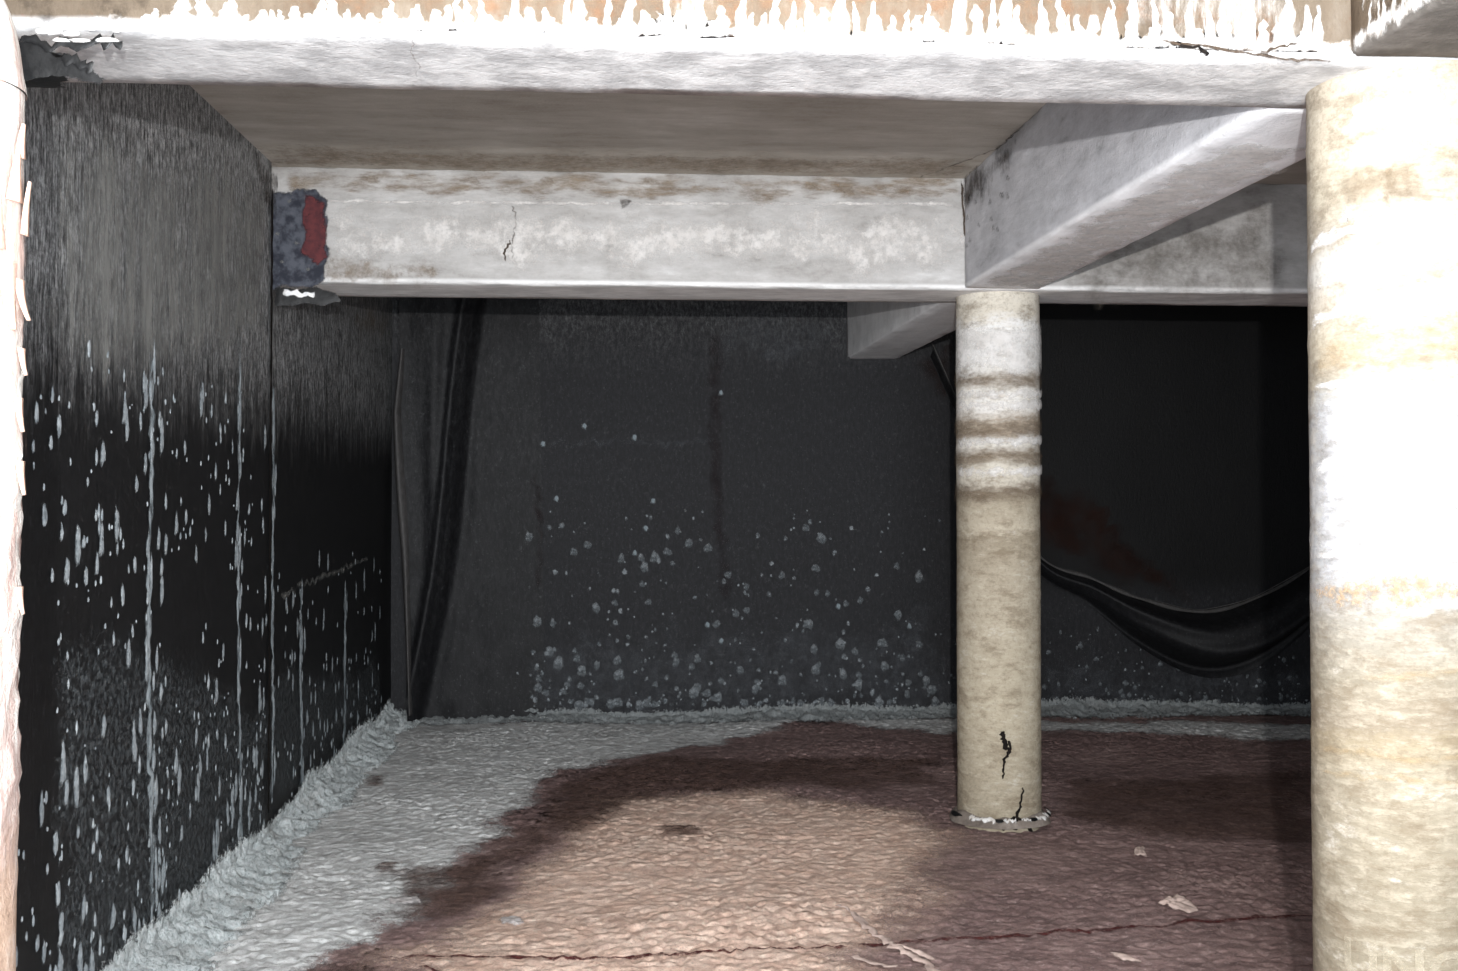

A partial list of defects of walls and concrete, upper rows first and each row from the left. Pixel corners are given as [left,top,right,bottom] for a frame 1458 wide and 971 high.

damp [120,0,1427,52]
peeling [0,123,32,376]
peeling [13,397,25,432]
peeling [15,461,26,495]
damp [16,152,986,971]
peeling [15,586,25,615]
crack [999,731,1033,832]
damp [1065,772,1311,840]
crack [380,914,1311,971]